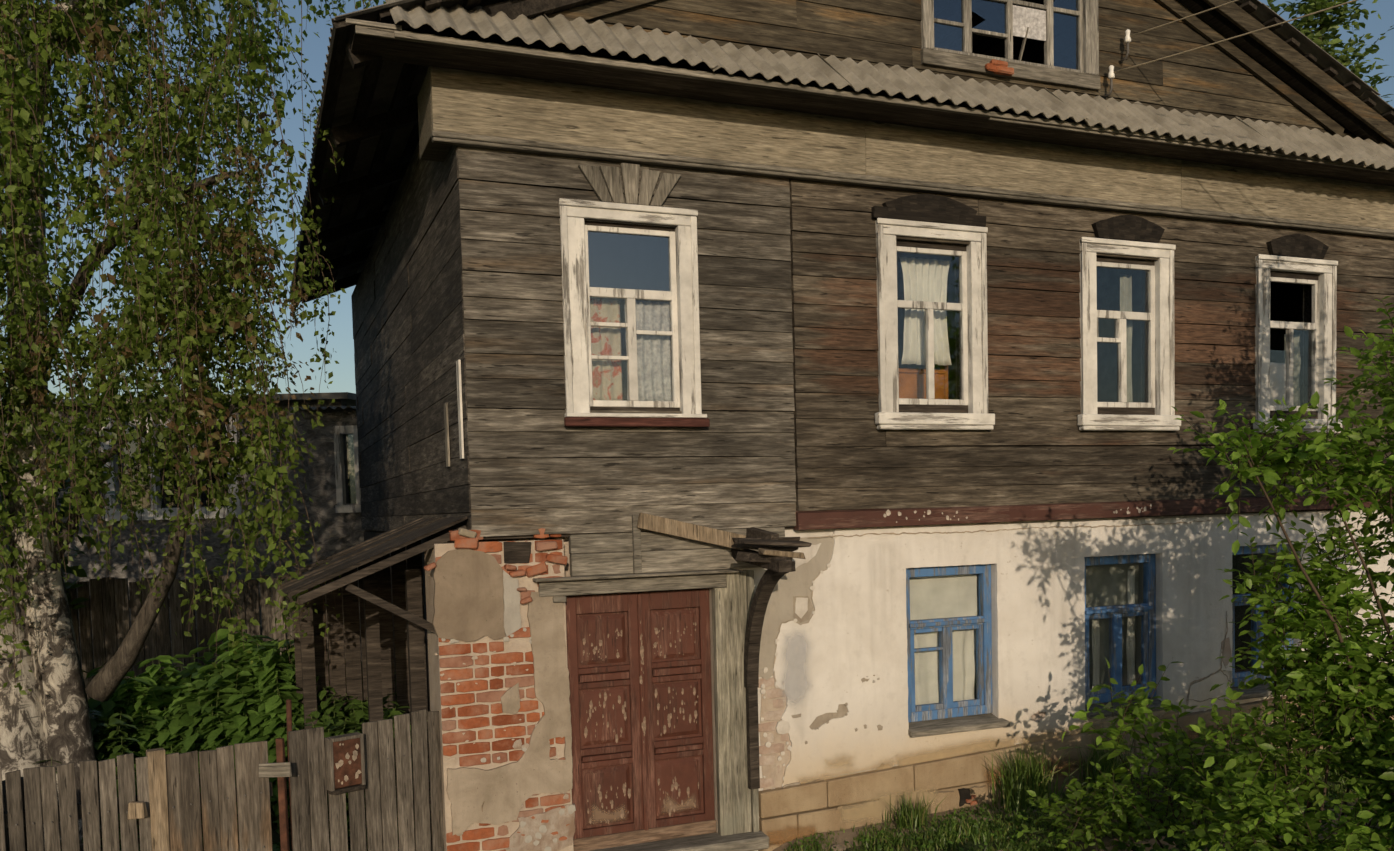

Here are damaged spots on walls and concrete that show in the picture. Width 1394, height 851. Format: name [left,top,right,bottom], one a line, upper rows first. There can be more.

spalling [449,528,568,604]
flaking render [435,627,545,767]
peeling [582,621,698,743]
flaking render [758,534,883,790]
flaking render [548,736,565,762]
flaking render [446,782,631,851]
peeling [657,777,699,816]